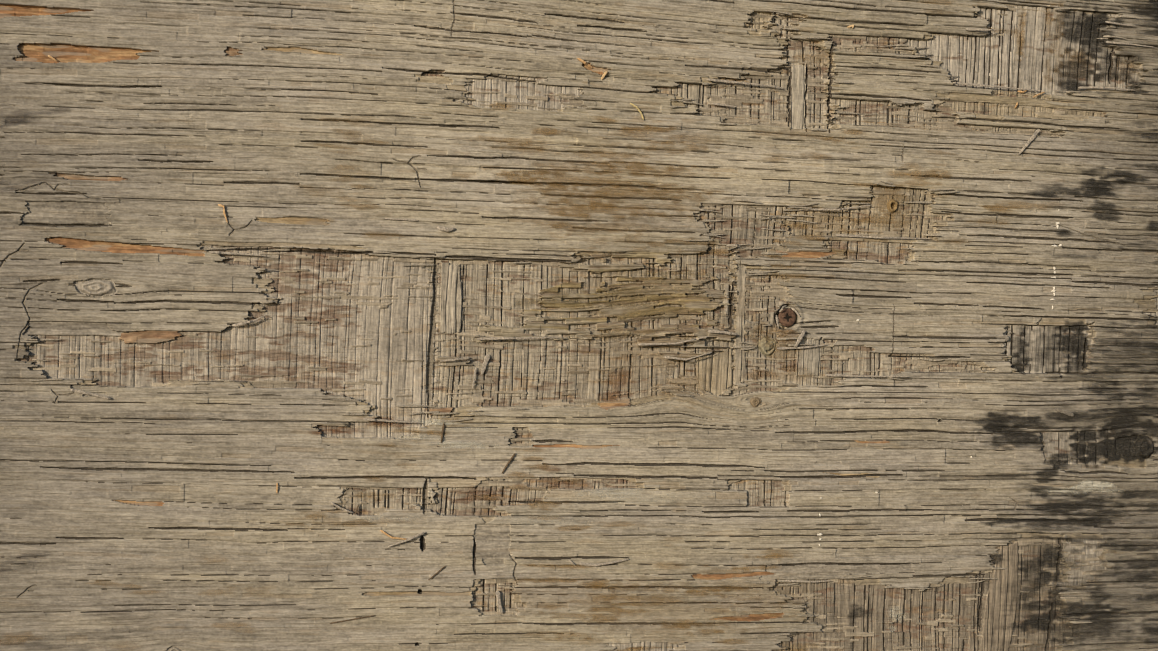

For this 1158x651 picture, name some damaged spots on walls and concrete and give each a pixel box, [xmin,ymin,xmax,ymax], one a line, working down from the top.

peeling [650,3,1155,137]
damp [1053,0,1146,94]
damp [1132,0,1158,34]
damp [1031,168,1153,221]
peeling [17,181,996,439]
peeling [1001,322,1096,378]
damp [1011,322,1103,391]
peeling [508,427,534,447]
damp [984,406,1158,526]
peeling [744,522,1108,651]
damp [1017,540,1110,641]